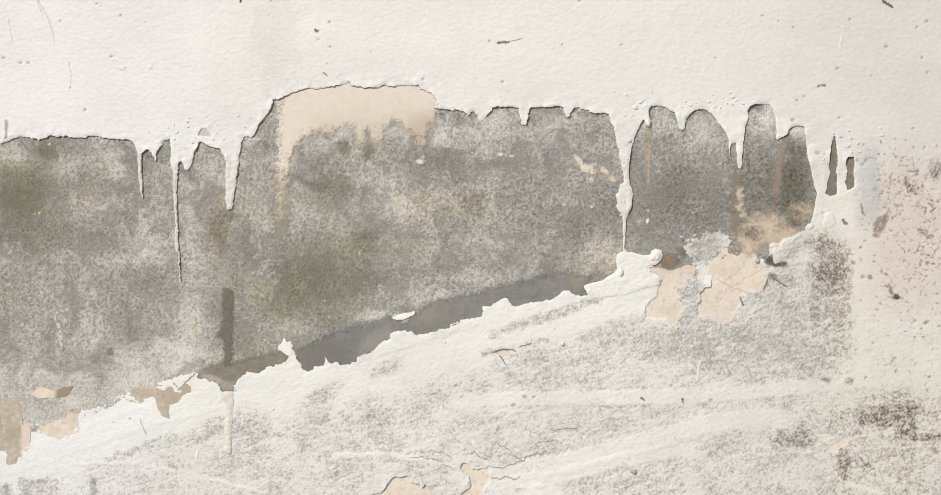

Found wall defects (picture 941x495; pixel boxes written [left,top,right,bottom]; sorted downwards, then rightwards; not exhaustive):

damp [218,239,234,366]
peeling [0,82,854,465]
damp [661,249,686,268]
damp [723,178,812,266]
peeling [372,476,432,495]
peeling [460,463,490,495]